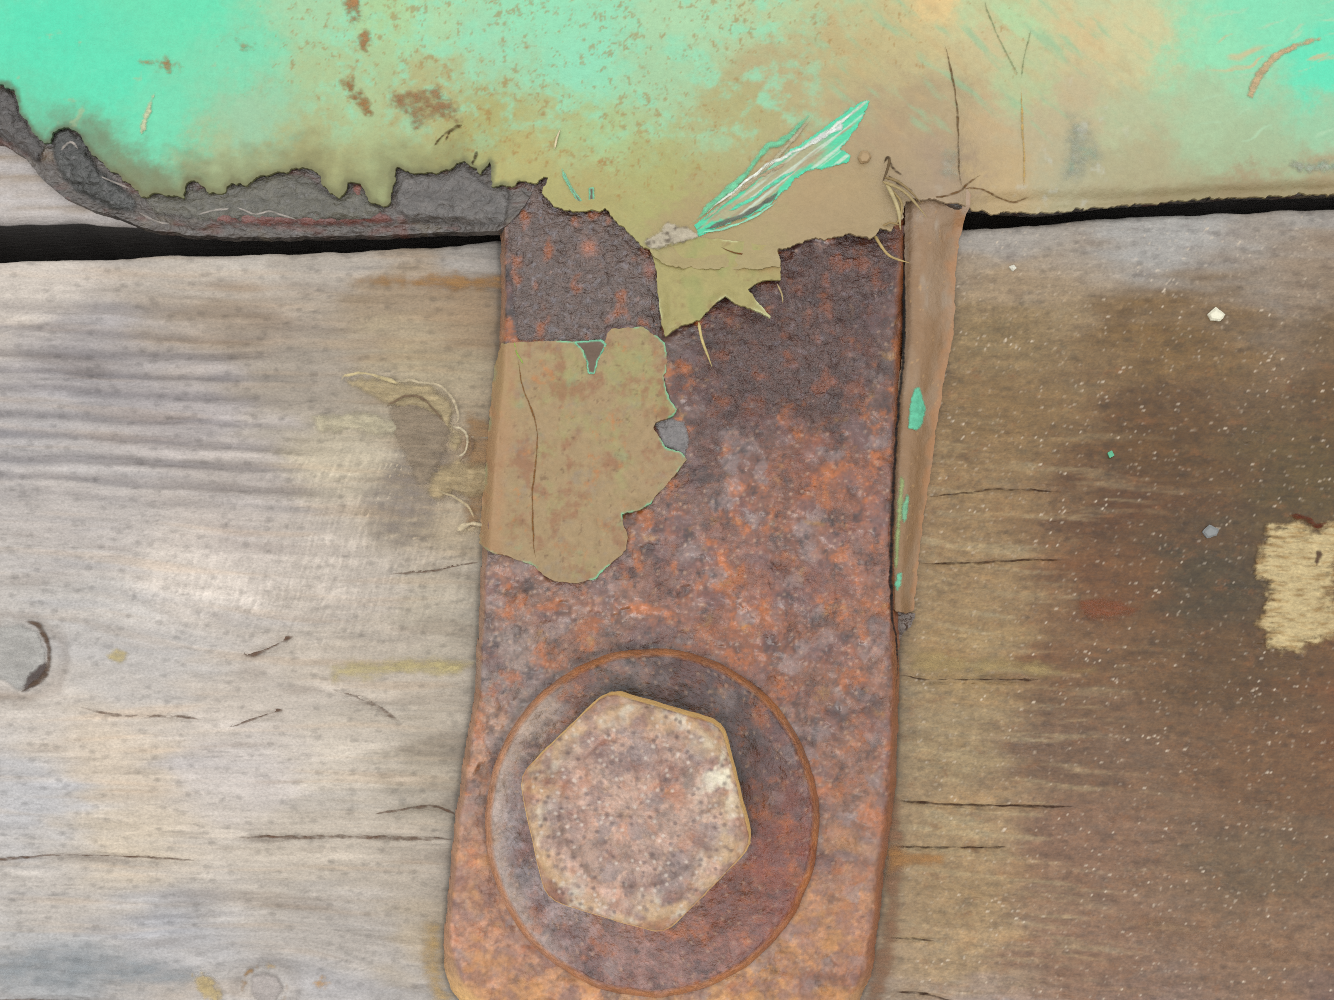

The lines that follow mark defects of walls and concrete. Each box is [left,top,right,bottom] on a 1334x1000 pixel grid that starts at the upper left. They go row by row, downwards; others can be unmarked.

rust [0,87,509,226]
peeling [314,180,971,682]
peeling [1256,514,1334,653]